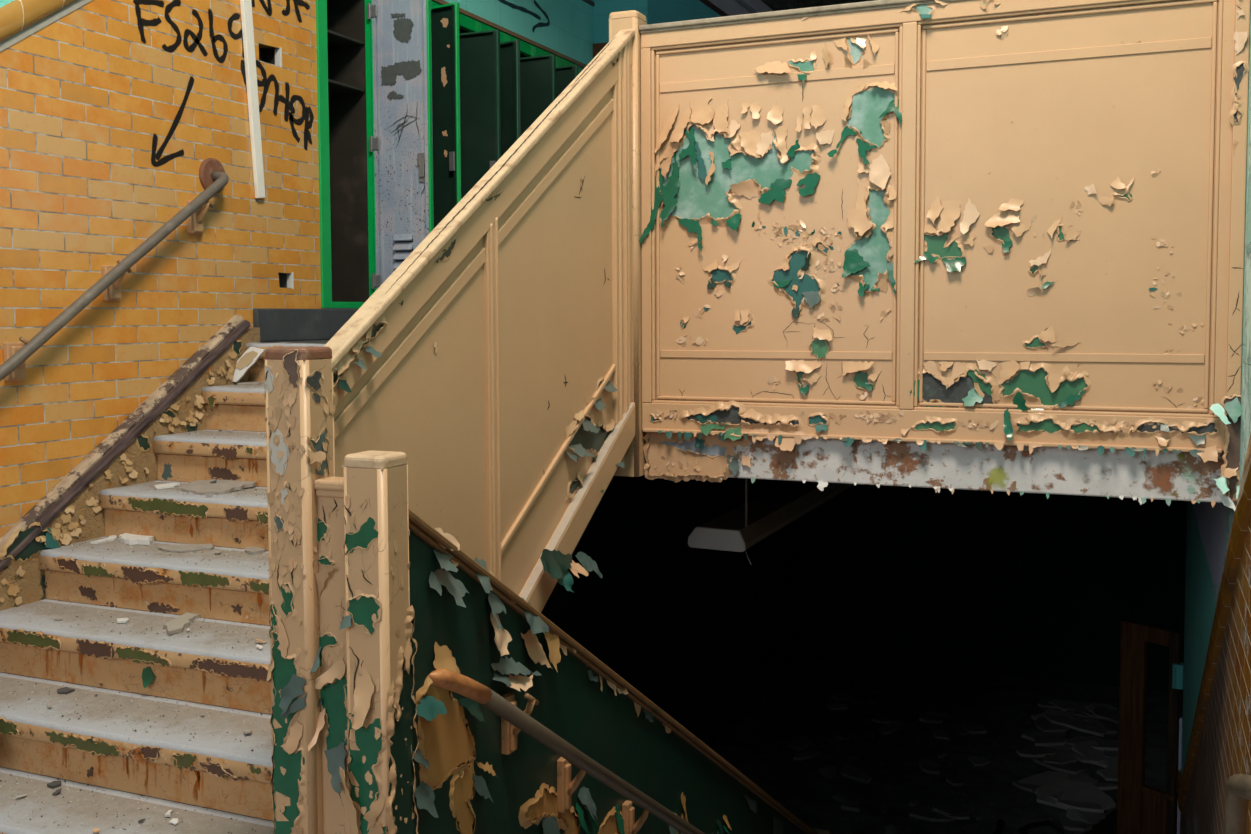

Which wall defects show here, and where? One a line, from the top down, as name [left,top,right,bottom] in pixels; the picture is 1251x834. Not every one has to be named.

peeling [754,34,880,82]
peeling [639,81,902,321]
peeling [915,194,1029,273]
peeling [1027,217,1080,296]
peeling [564,376,617,503]
leakage [772,450,828,469]
leakage [884,452,929,479]
peeling [643,324,1241,511]
leakage [989,467,1008,487]
leakage [1141,453,1195,494]
peeling [0,316,496,834]
peeling [518,783,580,834]